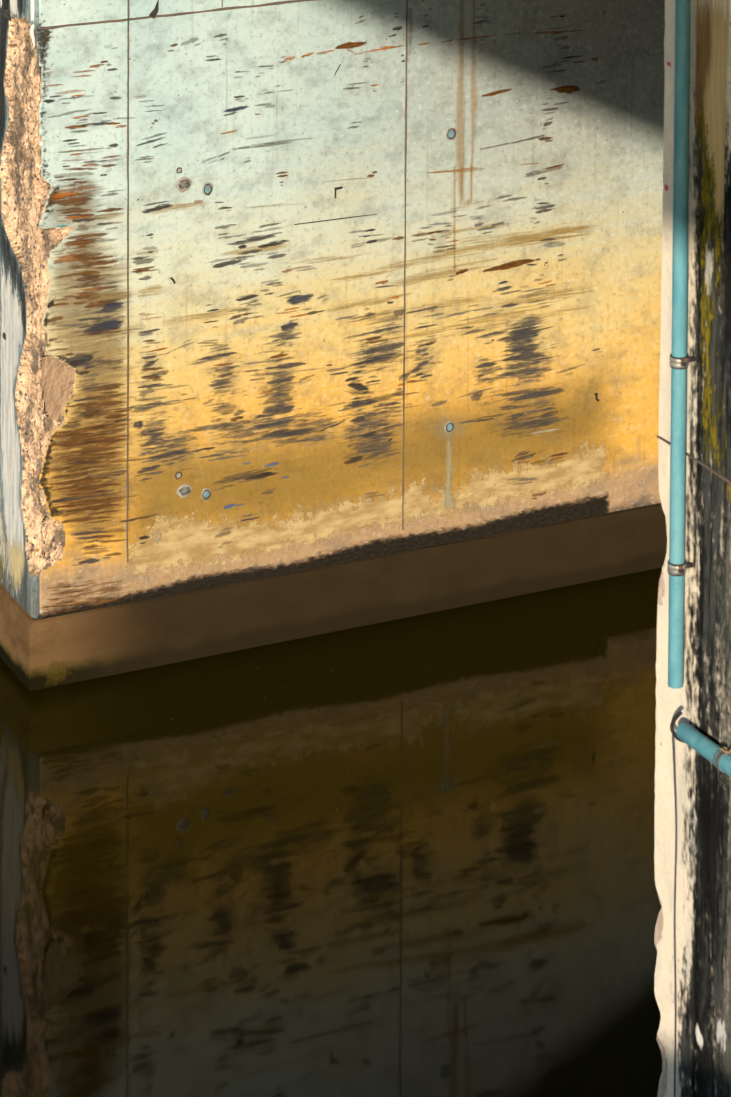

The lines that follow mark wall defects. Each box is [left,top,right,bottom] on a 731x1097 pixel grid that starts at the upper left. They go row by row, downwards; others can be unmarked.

corrosion [285,42,404,60]
damp [223,95,261,115]
damp [136,110,166,163]
spalling [0,15,75,577]
damp [43,95,127,335]
damp [132,251,157,290]
damp [137,199,193,213]
damp [213,222,287,268]
damp [392,196,586,256]
damp [684,1,731,751]
damp [37,268,611,620]
damp [678,746,731,1097]